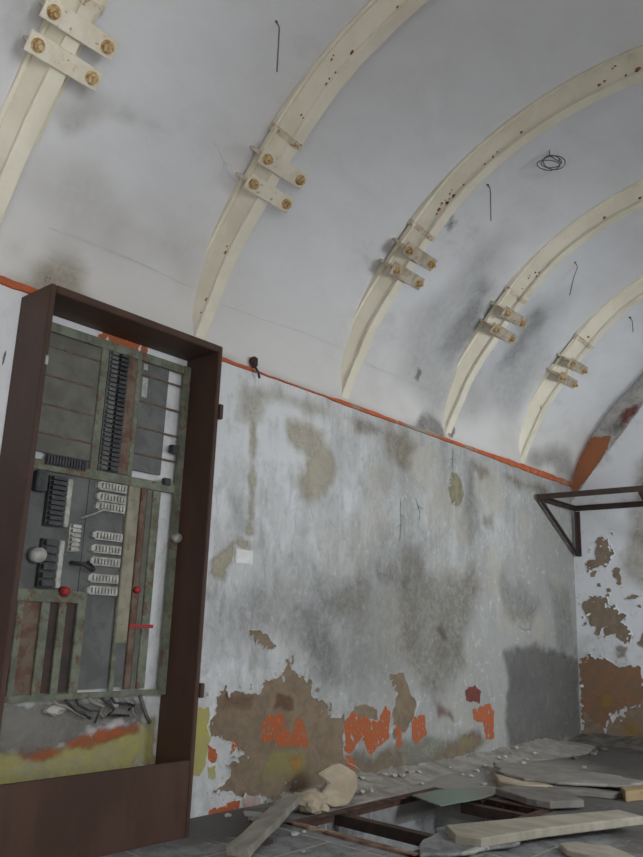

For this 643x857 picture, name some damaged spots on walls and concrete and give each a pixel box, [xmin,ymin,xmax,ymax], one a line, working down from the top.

spalling [571,405,638,491]
flaking render [247,628,277,651]
flaking render [577,532,643,737]
flaking render [193,654,494,819]
water stain [506,647,581,746]